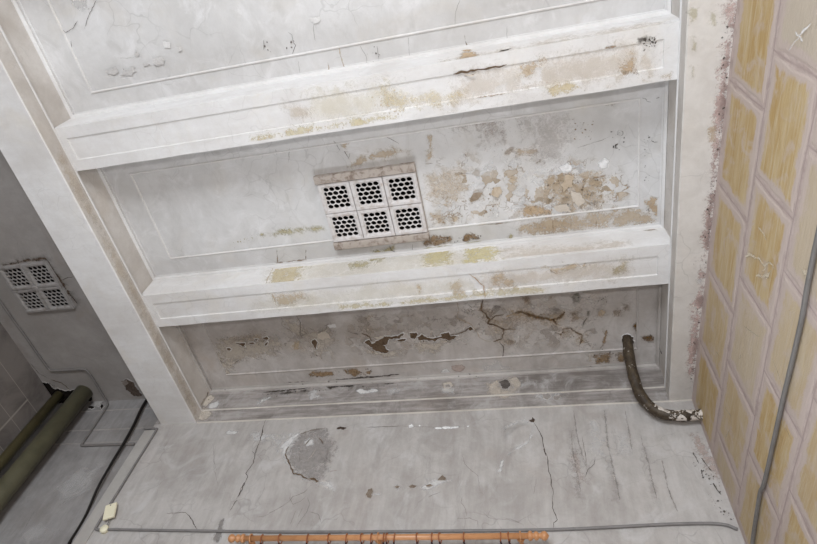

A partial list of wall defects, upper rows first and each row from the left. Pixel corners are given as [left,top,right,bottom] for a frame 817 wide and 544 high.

peeling [455,64,507,77]
leakage [701,3,736,250]
peeling [424,154,551,223]
leakage [267,252,306,283]
leakage [423,234,497,265]
flaking render [350,320,474,357]
leakage [687,262,706,376]
flaking render [41,380,75,404]
flaking render [121,378,143,397]
crack [167,420,266,542]
flaking render [274,426,347,487]
crack [528,417,558,528]